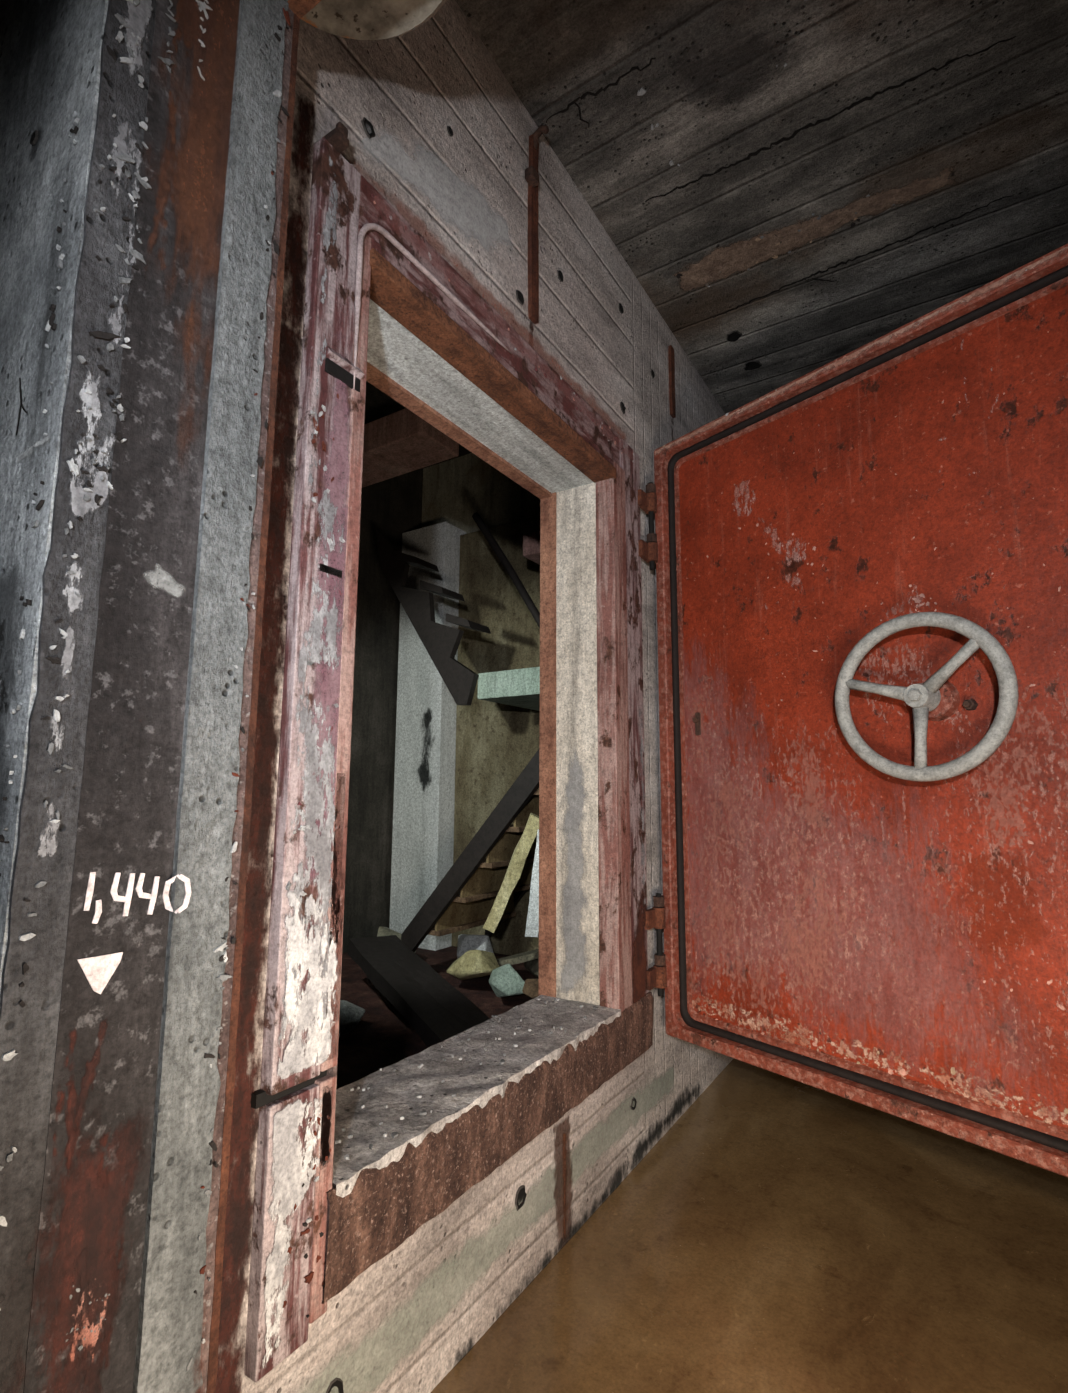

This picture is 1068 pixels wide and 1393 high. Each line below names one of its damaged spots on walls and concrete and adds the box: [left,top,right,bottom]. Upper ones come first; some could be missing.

corrosion [149,0,240,278]
crack [546,57,656,128]
spalling [674,167,957,292]
peeling [64,111,152,534]
corrosion [369,205,625,483]
peeling [46,553,83,676]
peeling [40,694,73,773]
peeling [277,335,350,1080]
peeling [38,800,60,857]
spalling [19,881,47,941]
spalling [1,1049,18,1061]
peeling [692,994,1068,1124]